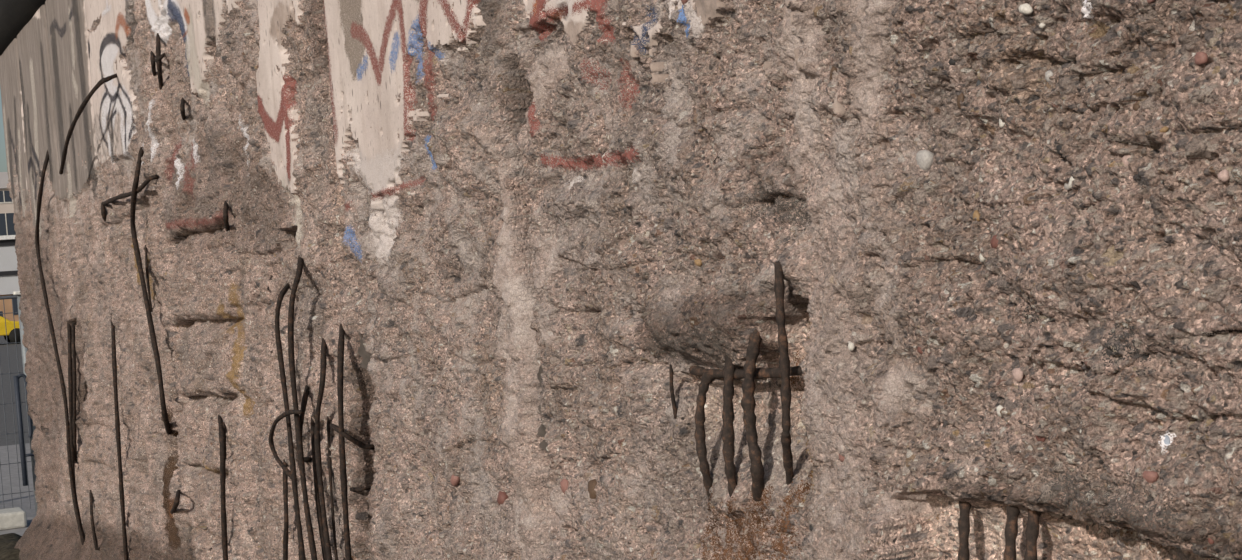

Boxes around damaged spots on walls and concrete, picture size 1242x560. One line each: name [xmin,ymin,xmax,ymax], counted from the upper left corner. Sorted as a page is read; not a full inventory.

spalling [7,0,377,560]
corrosion [700,436,814,560]
spalling [338,0,1242,560]